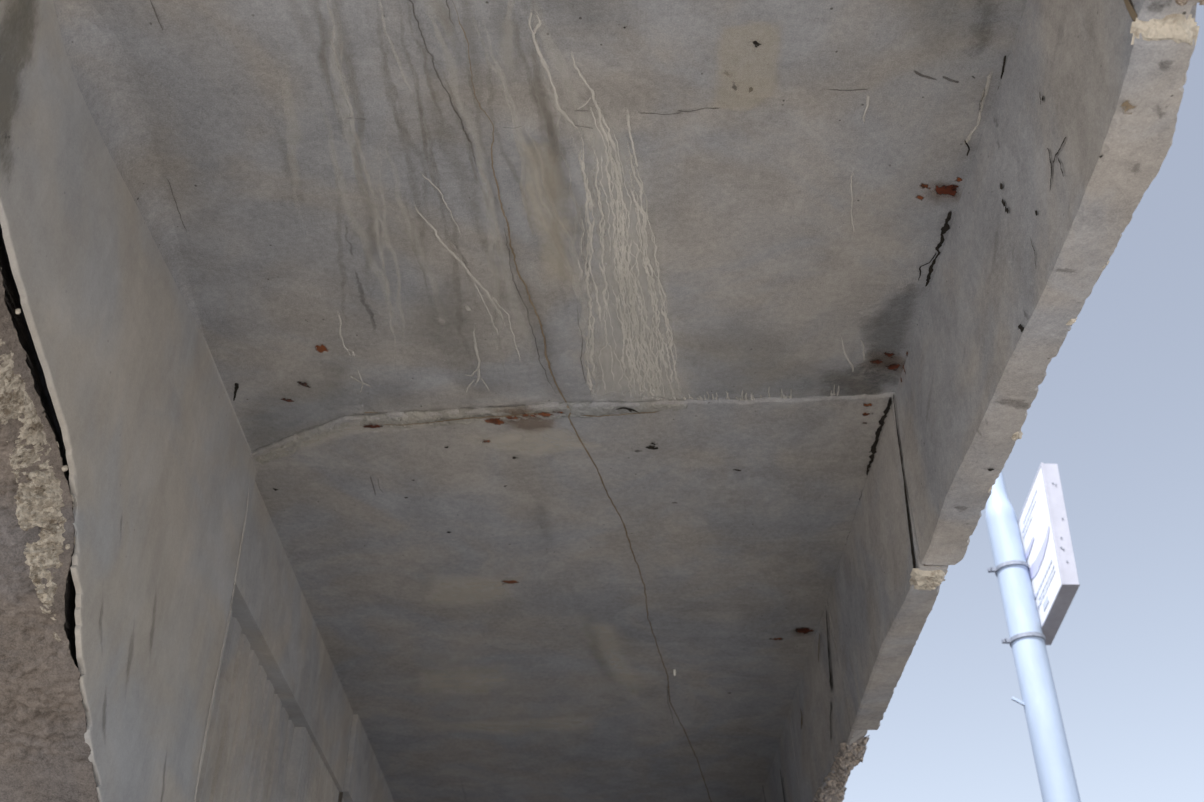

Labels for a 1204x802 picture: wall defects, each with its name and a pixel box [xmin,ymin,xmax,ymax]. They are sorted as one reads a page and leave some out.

spalling [1130,0,1204,45]
corrosion [917,177,962,200]
crack [918,210,952,286]
corrosion [363,412,563,428]
crack [409,0,718,802]
spalling [0,336,75,641]
crack [859,393,915,568]
spalling [812,735,870,802]